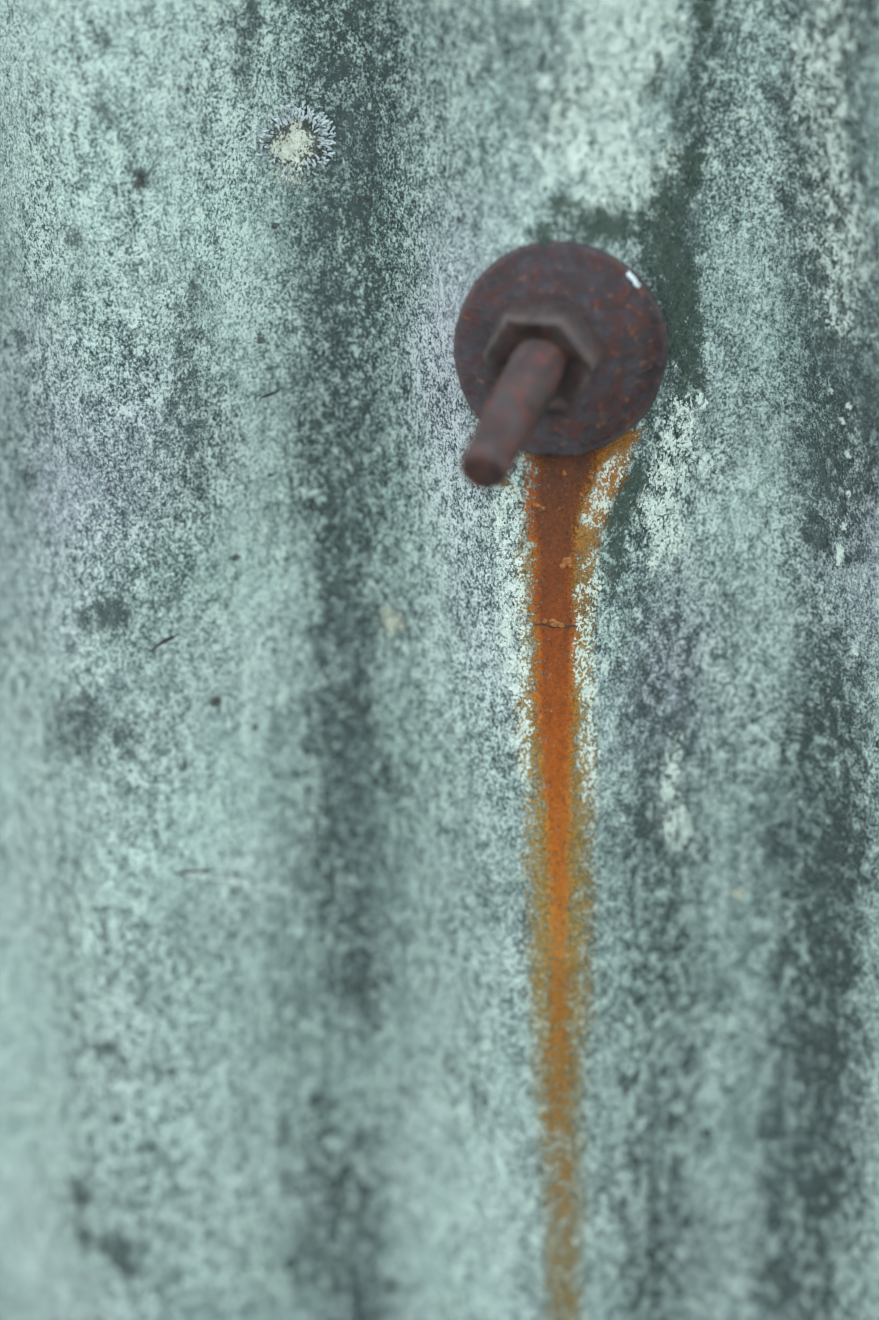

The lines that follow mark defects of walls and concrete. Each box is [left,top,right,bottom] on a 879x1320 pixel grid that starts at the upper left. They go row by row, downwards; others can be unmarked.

rust [489,427,657,1320]